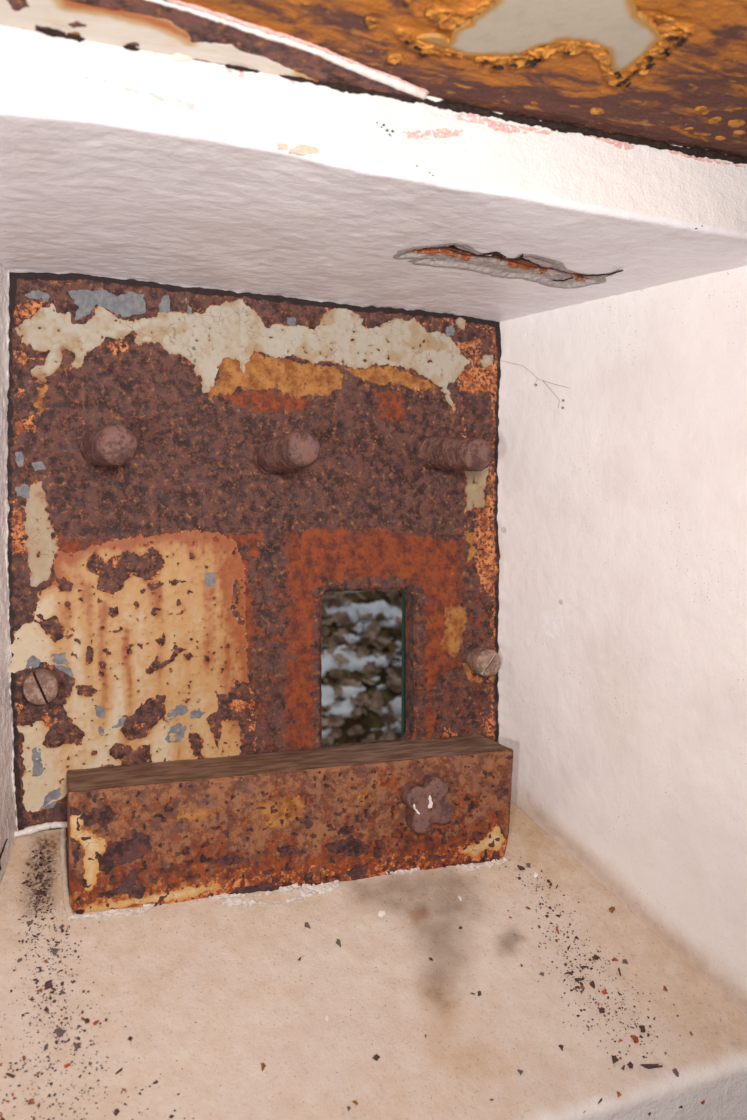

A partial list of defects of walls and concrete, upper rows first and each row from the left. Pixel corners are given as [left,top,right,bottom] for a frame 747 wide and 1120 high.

peeling [387,0,694,87]
rust [684,106,746,141]
spalling [392,243,623,289]
rust [70,755,511,914]
rust [32,840,54,903]